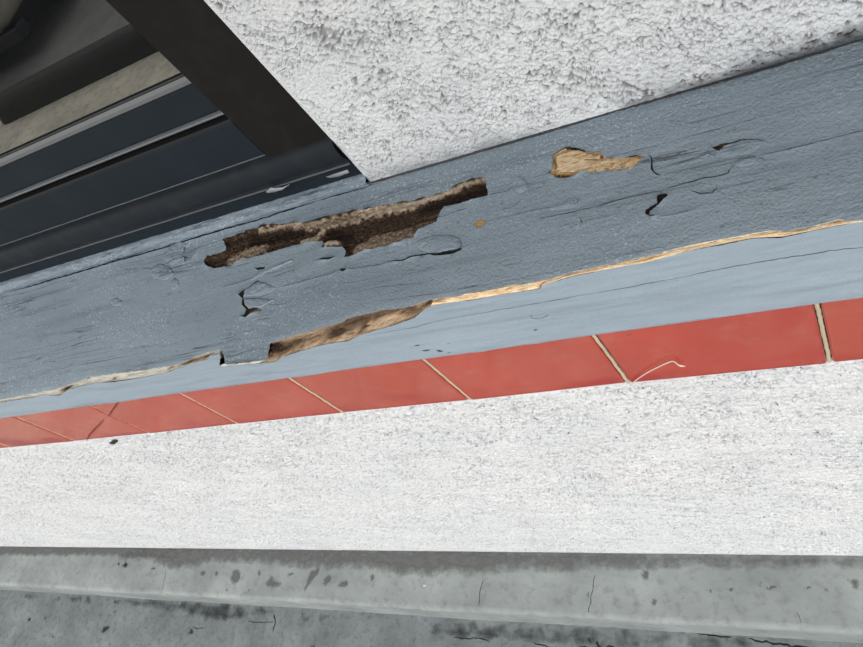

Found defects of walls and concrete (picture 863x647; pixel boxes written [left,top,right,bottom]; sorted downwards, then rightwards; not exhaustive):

peeling [555,150,641,173]
crack [550,131,860,223]
crack [239,267,265,317]